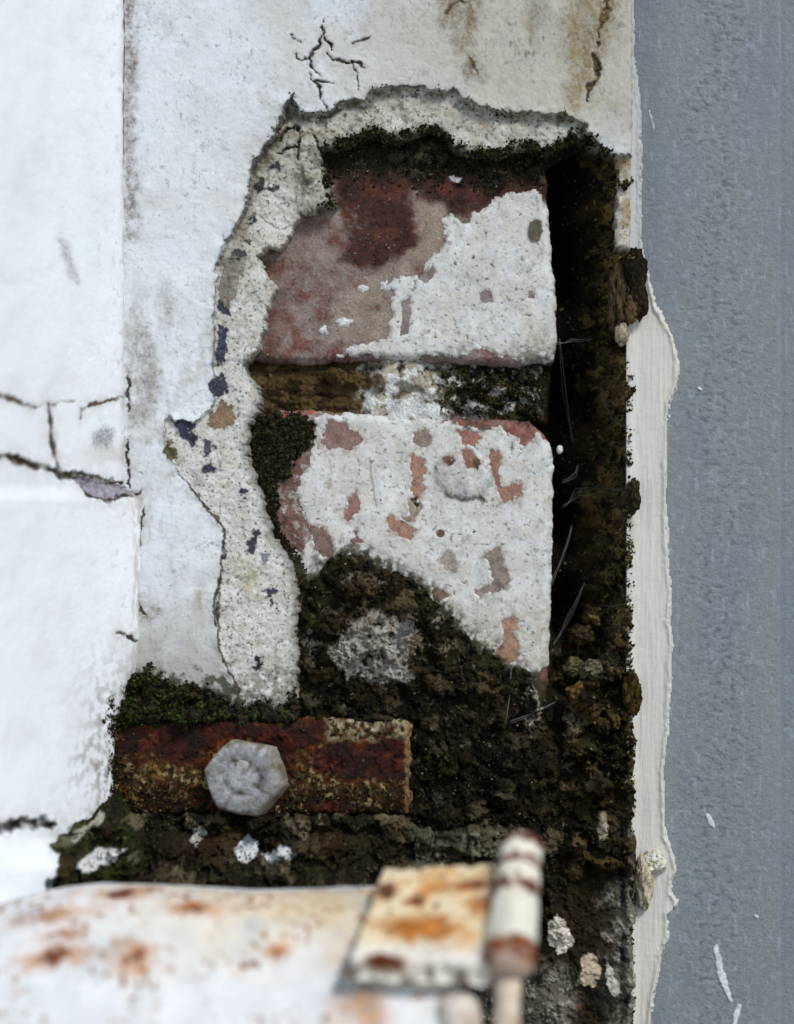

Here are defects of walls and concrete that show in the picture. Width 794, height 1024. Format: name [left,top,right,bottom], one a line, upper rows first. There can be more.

crack [291,21,369,109]
flaking render [162,85,649,709]
crack [0,375,145,546]
damp [114,505,636,895]
flaking render [621,669,643,717]
rust [115,720,407,785]
peeling [190,826,207,847]
peeling [234,835,297,864]
peeling [594,811,609,841]